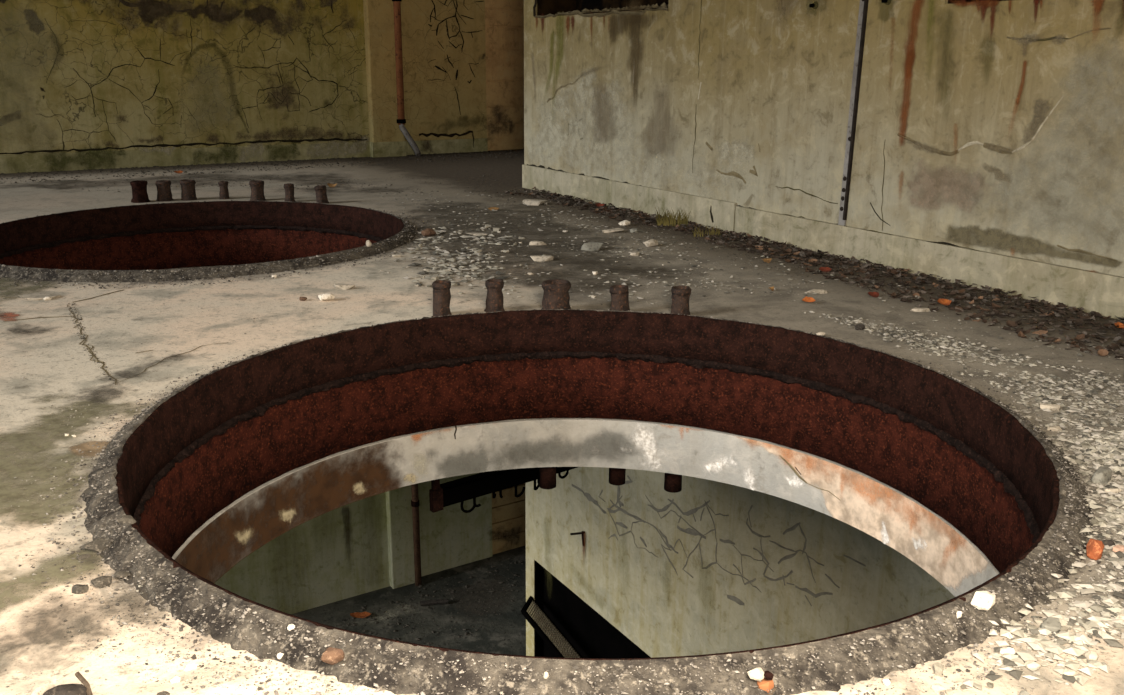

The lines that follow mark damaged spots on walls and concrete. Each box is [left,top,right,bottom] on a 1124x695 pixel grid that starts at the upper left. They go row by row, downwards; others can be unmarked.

crack [0,0,367,154]
crack [419,0,484,147]
damp [610,4,653,86]
corrosion [900,0,922,144]
corrosion [954,0,1011,33]
corrosion [1016,61,1026,104]
crack [1,290,221,385]
corrosion [852,478,893,505]
crack [572,475,866,606]